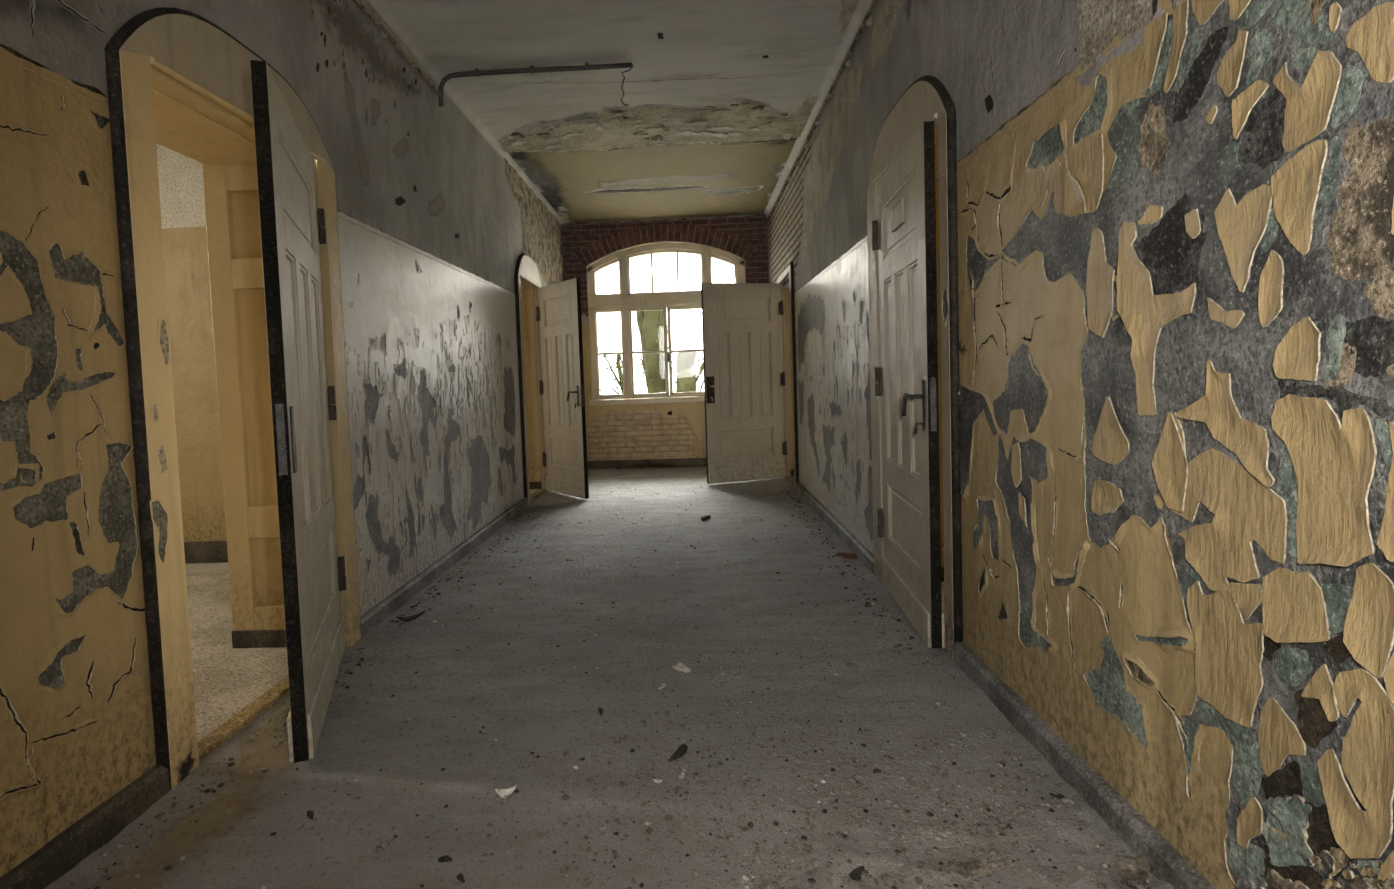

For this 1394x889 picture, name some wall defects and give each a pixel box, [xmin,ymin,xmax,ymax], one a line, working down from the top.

crack [0,93,67,139]
crack [22,203,49,243]
peeling [76,168,91,190]
crack [60,305,89,333]
peeling [503,55,874,544]
peeling [0,226,171,616]
crack [74,391,111,541]
peeling [345,300,521,582]
peeling [959,0,1394,889]
crack [29,537,38,551]
peeling [32,630,87,695]
crack [0,599,145,804]